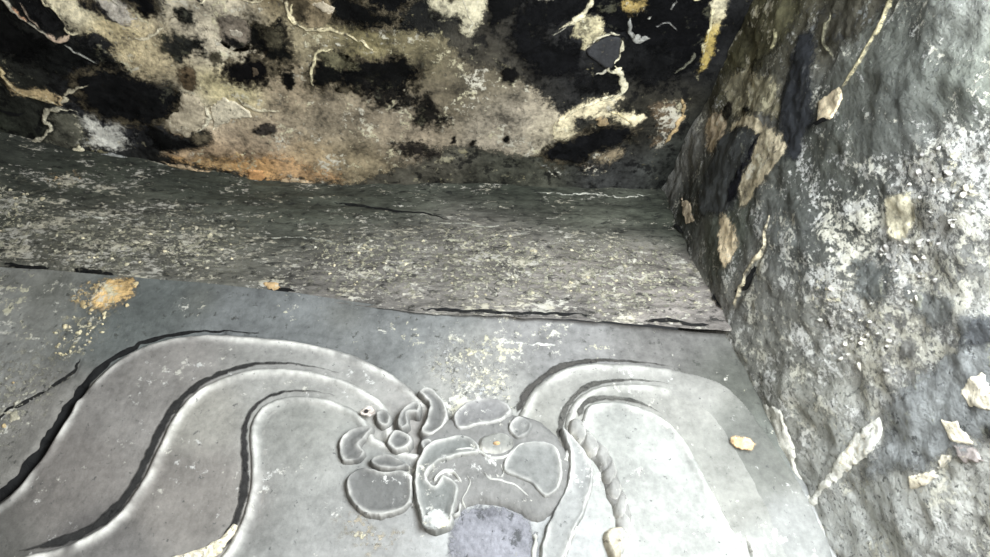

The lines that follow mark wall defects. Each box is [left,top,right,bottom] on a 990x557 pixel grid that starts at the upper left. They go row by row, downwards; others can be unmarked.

leakage [78,114,128,158]
crack [0,361,80,422]